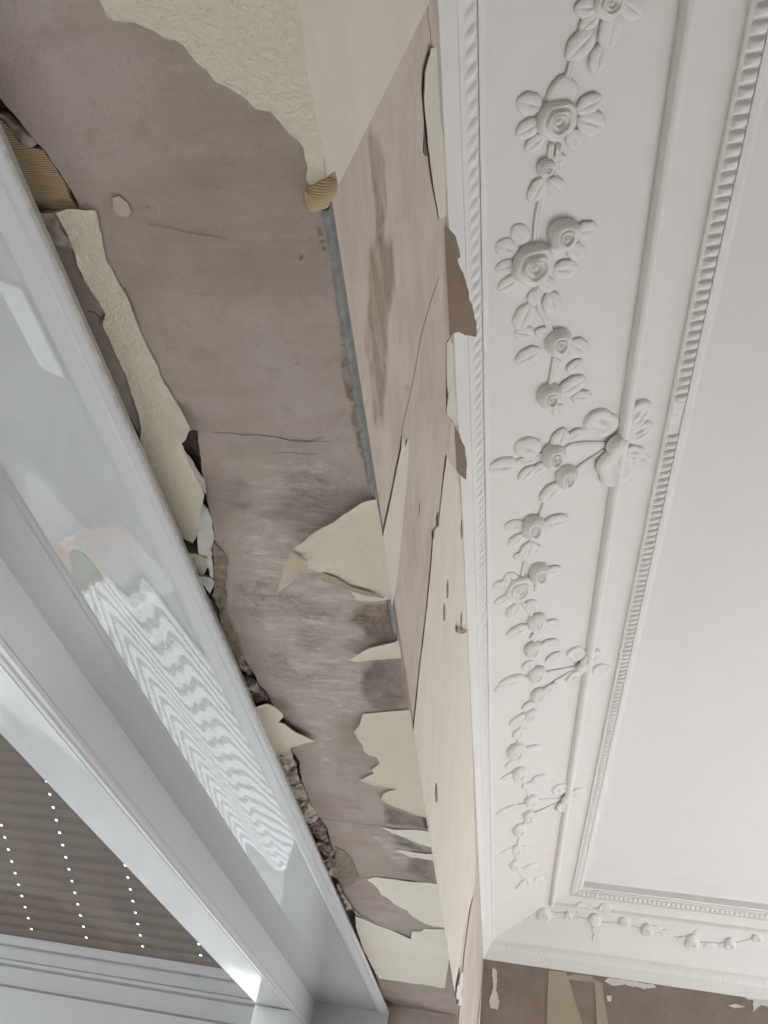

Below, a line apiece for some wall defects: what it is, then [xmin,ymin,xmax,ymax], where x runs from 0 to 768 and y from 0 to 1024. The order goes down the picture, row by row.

flaking render [0,111,38,149]
flaking render [40,211,73,250]
water stain [369,182,394,420]
crack [214,432,320,455]
flaking render [278,750,358,910]